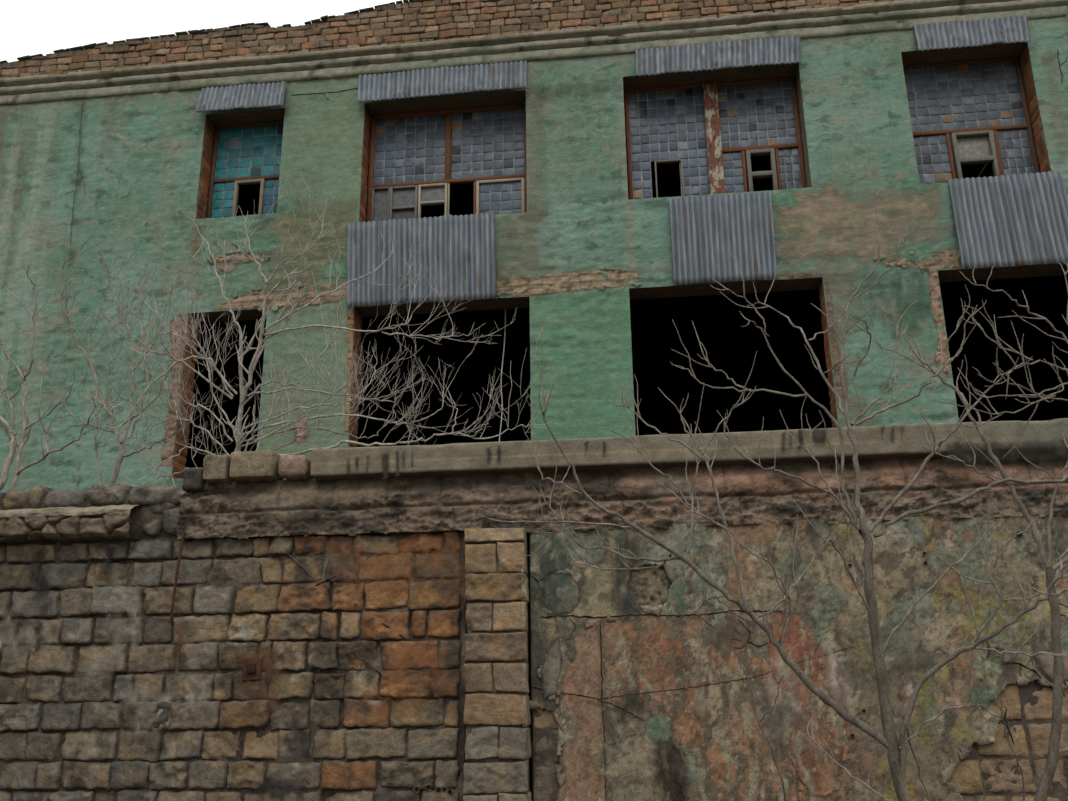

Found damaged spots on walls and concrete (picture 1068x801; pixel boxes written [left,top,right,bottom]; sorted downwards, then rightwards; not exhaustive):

peeling [206,197,354,433]
peeling [771,174,960,409]
spalling [176,453,1068,539]
peeling [529,562,855,801]
crack [531,570,853,801]
spalling [941,531,1068,801]